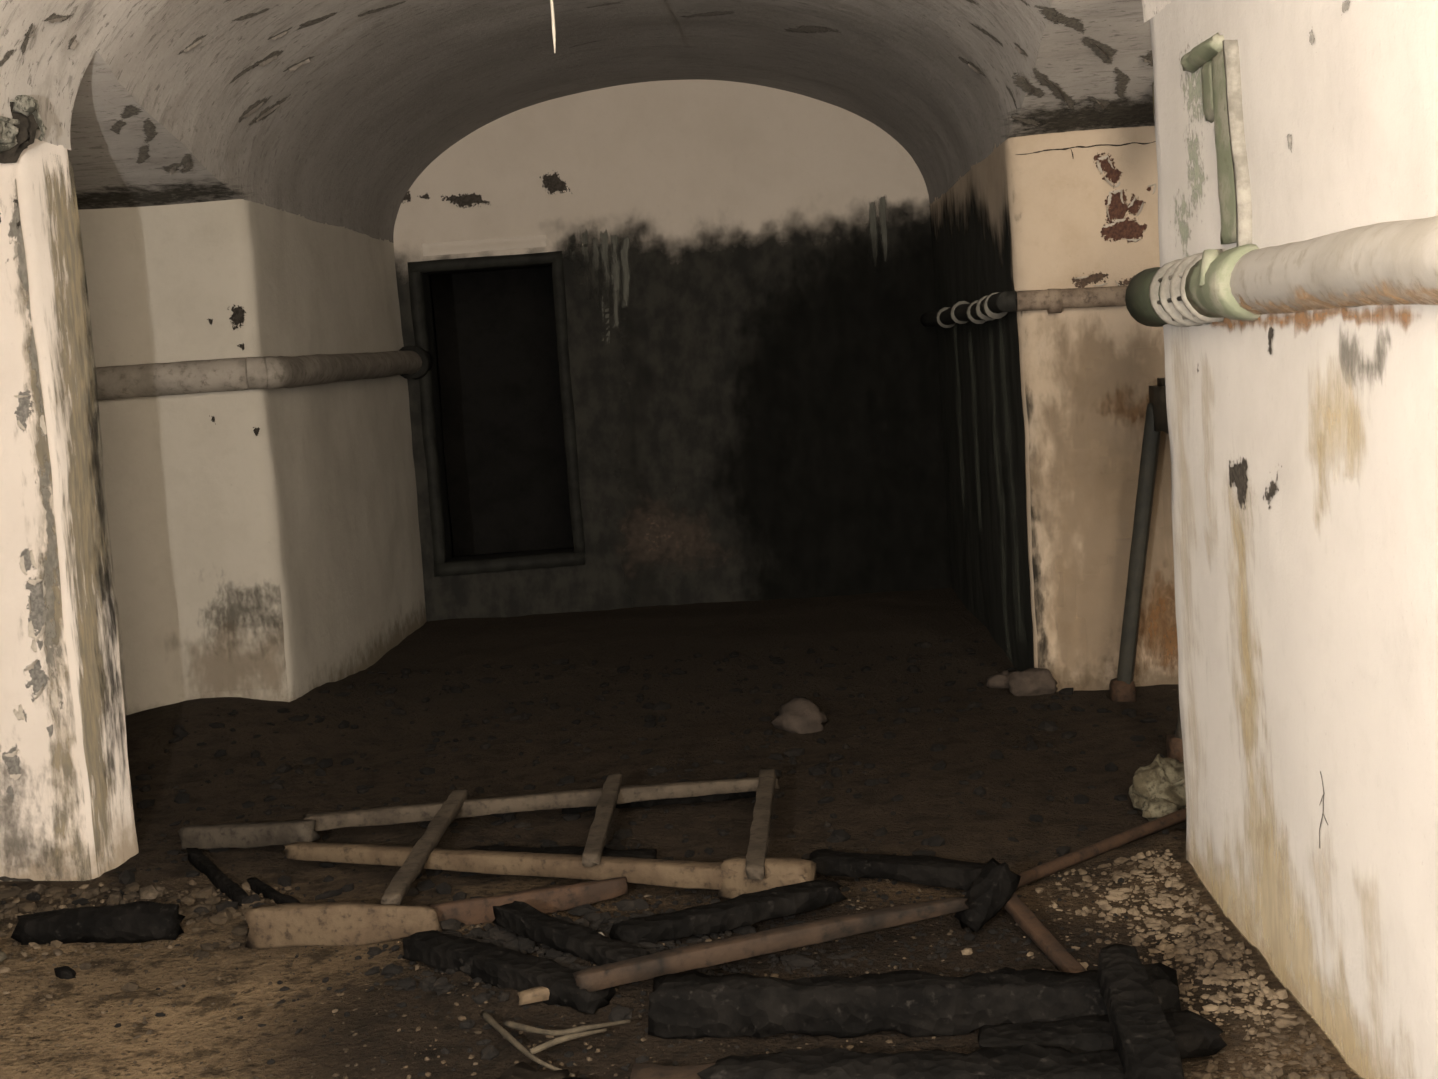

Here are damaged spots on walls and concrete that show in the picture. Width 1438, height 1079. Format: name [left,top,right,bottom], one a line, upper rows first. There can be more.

peeling [0,13,71,66]
peeling [402,191,489,208]
peeling [540,170,570,194]
peeling [1093,153,1156,242]
water stain [395,259,415,347]
corrosion [1212,283,1438,329]
water stain [1341,341,1384,375]
water stain [407,189,1047,672]
spalling [1229,458,1248,510]
spalling [1263,465,1282,509]
water stain [1,169,243,881]
water stain [1210,817,1382,1079]